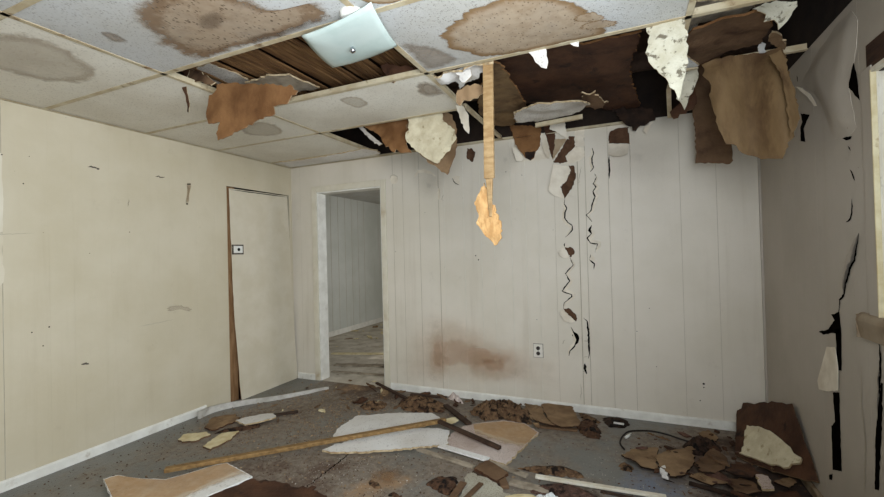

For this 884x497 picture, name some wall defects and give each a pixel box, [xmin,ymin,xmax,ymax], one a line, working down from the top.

water stain [136,0,326,58]
water stain [408,0,618,67]
peeling [528,49,548,69]
spalling [510,119,585,198]
spalling [608,127,631,177]
crack [558,148,601,397]
crack [817,202,883,495]